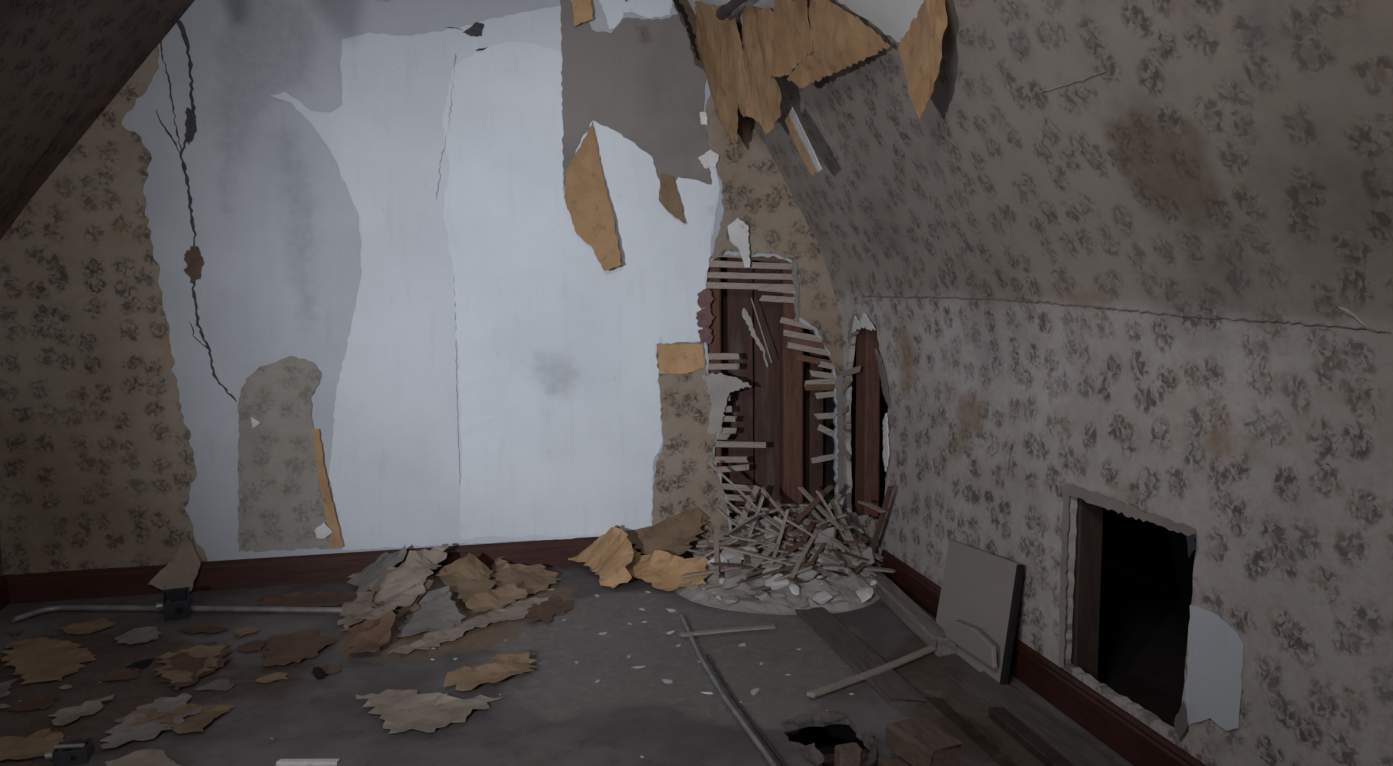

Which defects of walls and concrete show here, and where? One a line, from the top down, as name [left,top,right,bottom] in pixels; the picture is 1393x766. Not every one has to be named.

peeling [311,429,343,548]